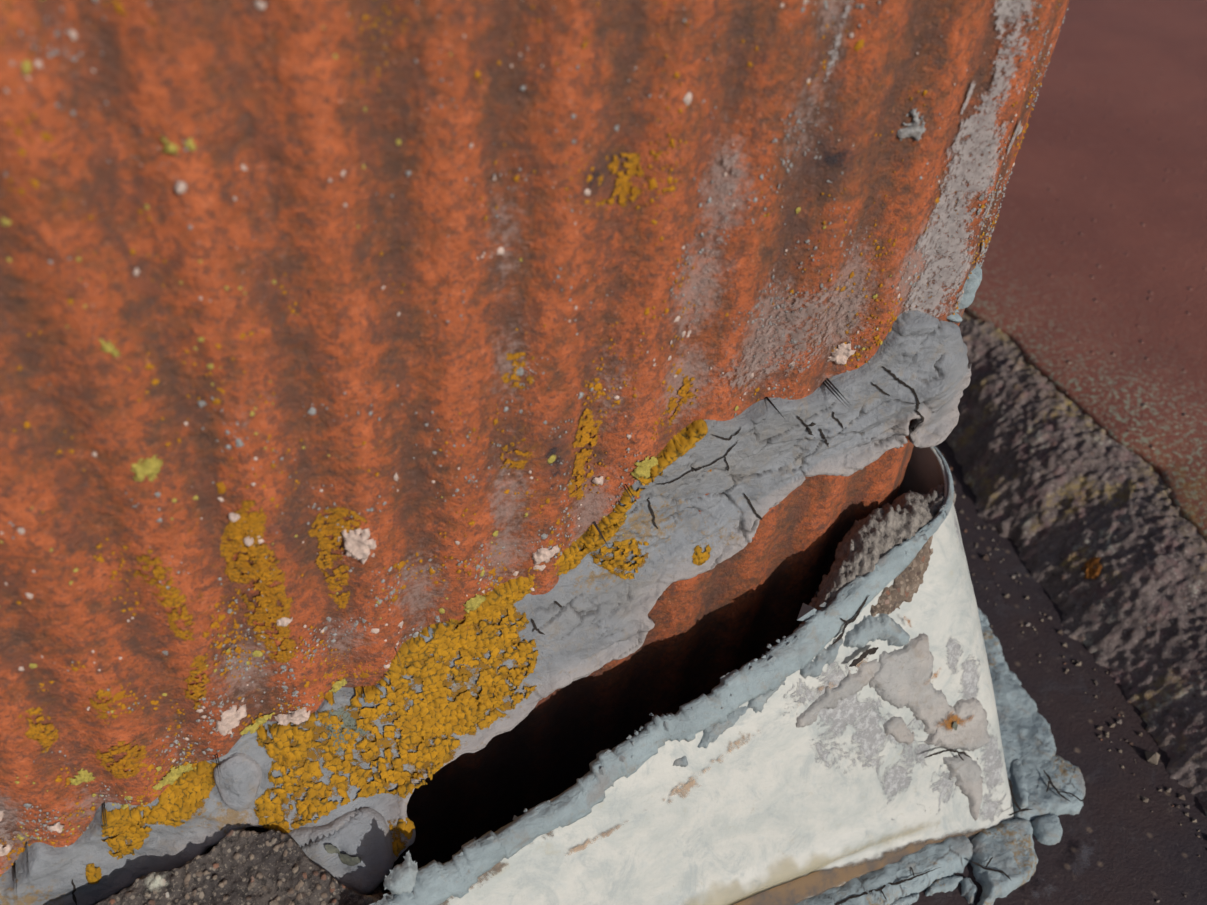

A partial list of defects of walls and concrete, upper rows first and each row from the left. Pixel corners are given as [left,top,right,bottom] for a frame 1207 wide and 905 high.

crack [871,366,924,434]
crack [797,412,844,447]
crack [646,428,762,529]
crack [531,601,562,635]
corrosion [940,712,973,731]
crack [1008,770,1086,816]
crack [834,867,941,905]
crack [971,857,1011,880]